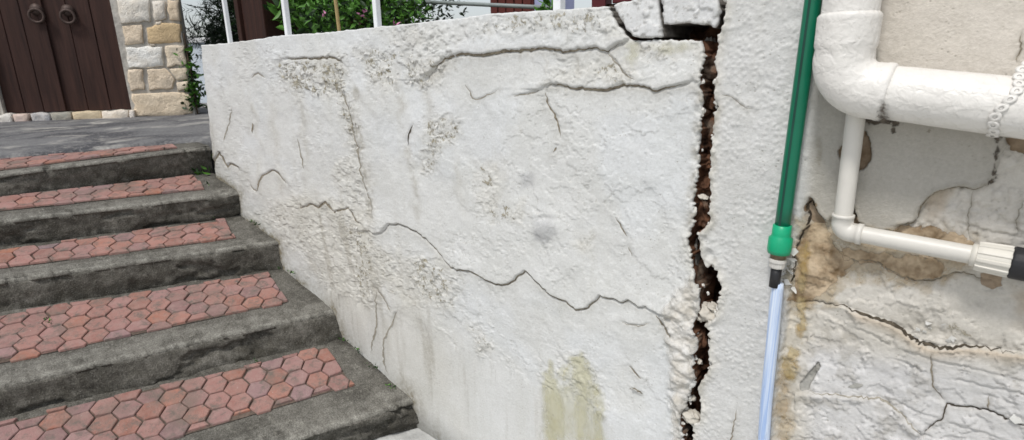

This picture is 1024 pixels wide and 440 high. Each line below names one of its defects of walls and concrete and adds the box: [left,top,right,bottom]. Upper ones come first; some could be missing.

crack [215,110,304,191]
crack [288,56,670,337]
crack [437,26,750,372]
spalling [781,198,944,302]
crack [839,252,982,281]
spalling [894,223,974,245]
crack [912,185,987,236]
spalling [980,273,1002,289]
crack [371,291,396,368]
crack [813,301,1024,434]
crack [681,395,701,436]